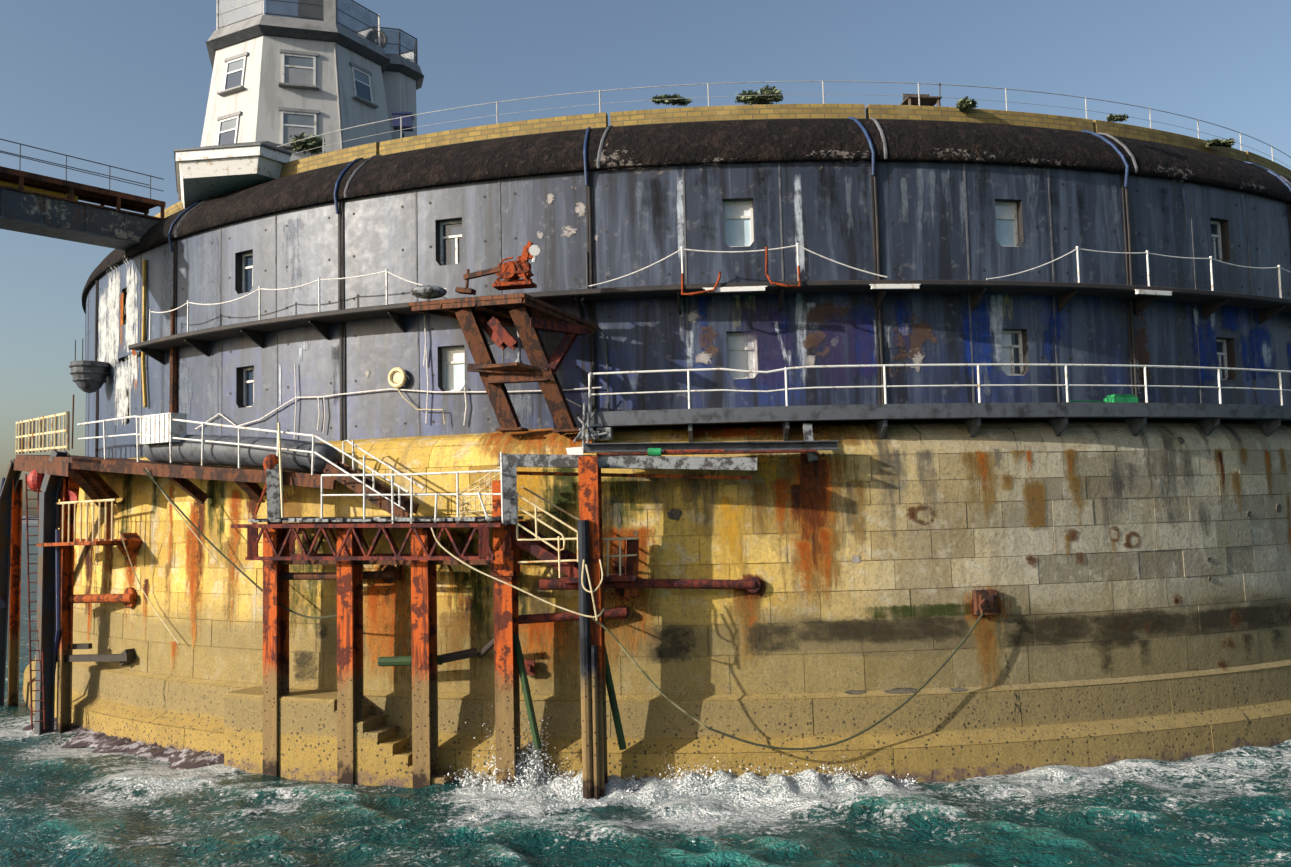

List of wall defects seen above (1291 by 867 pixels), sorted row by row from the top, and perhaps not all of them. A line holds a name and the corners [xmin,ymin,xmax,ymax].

peeling [803,299,852,366]
corrosion [74,482,204,646]
corrosion [224,490,257,630]
corrosion [283,491,306,622]
corrosion [672,422,876,662]
corrosion [906,505,936,524]
corrosion [963,450,1046,529]
corrosion [1064,449,1087,565]
corrosion [1215,448,1246,511]
leakage [647,628,694,662]
leakage [747,616,969,651]
leakage [1004,604,1291,669]